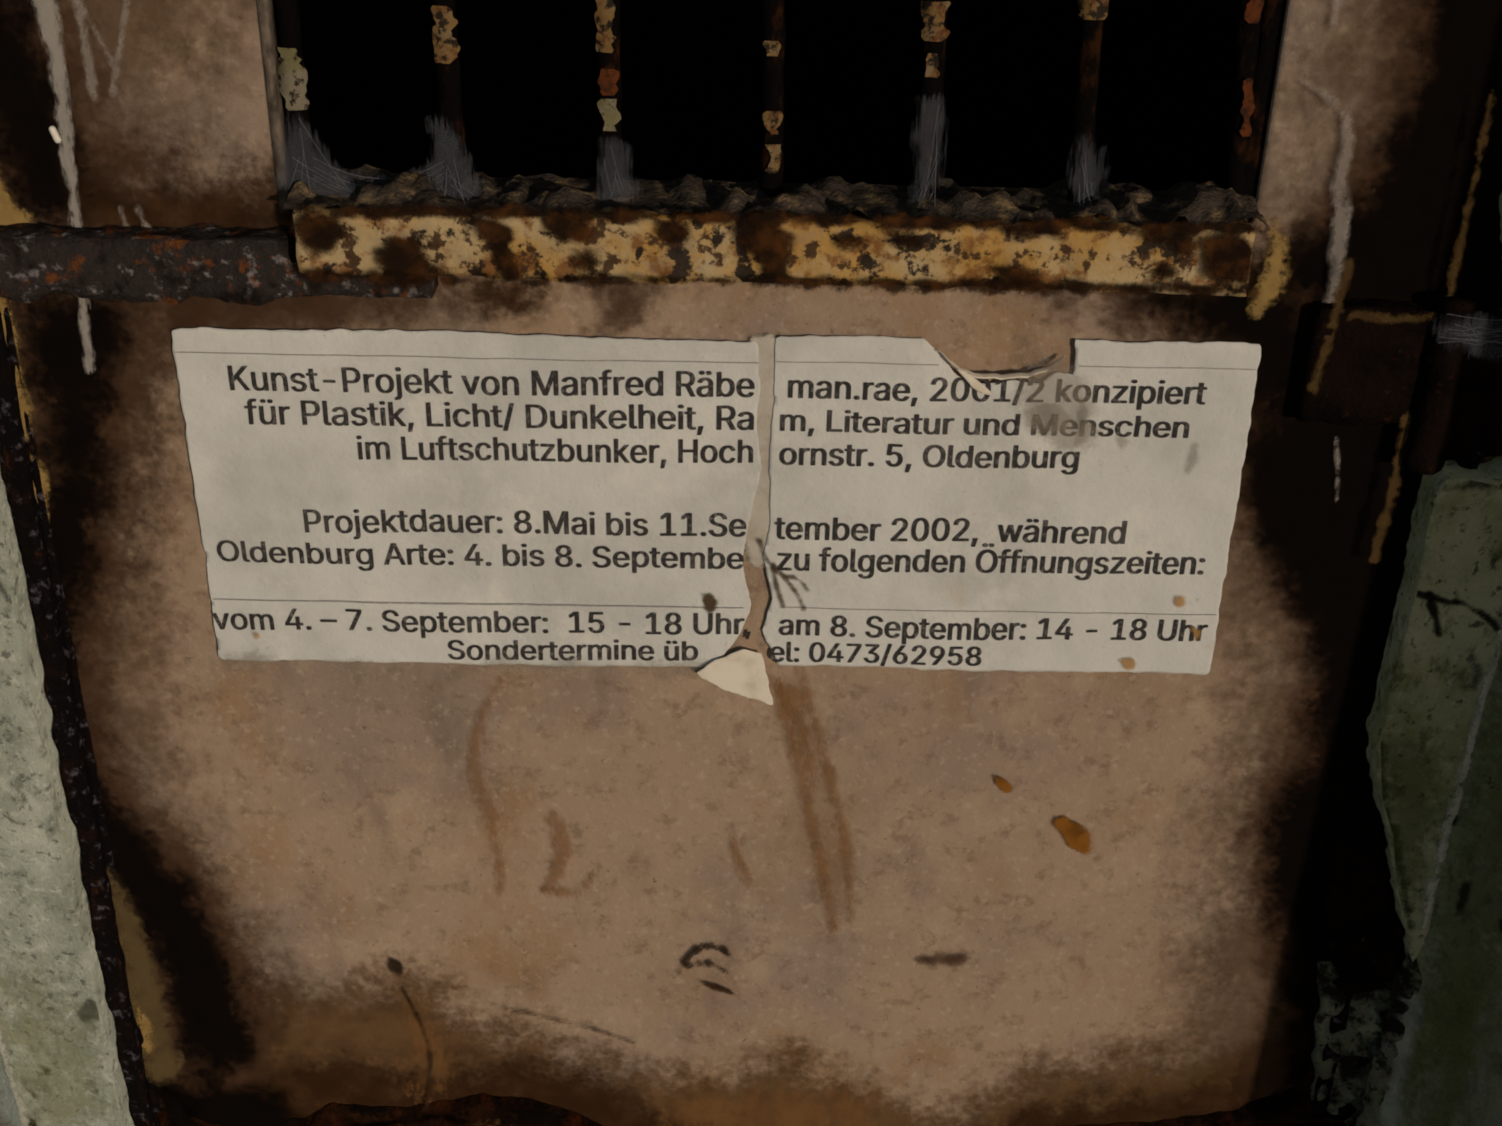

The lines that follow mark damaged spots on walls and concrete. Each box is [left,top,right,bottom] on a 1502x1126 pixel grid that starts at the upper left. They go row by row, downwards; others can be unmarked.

water stain [33,0,81,228]
water stain [79,298,93,372]
corrosion [20,0,189,192]
corrosion [47,203,1307,414]
water stain [1321,93,1353,303]
corrosion [1295,0,1422,239]
corrosion [75,559,183,847]
corrosion [235,463,1327,1126]
spalling [1292,742,1422,1126]